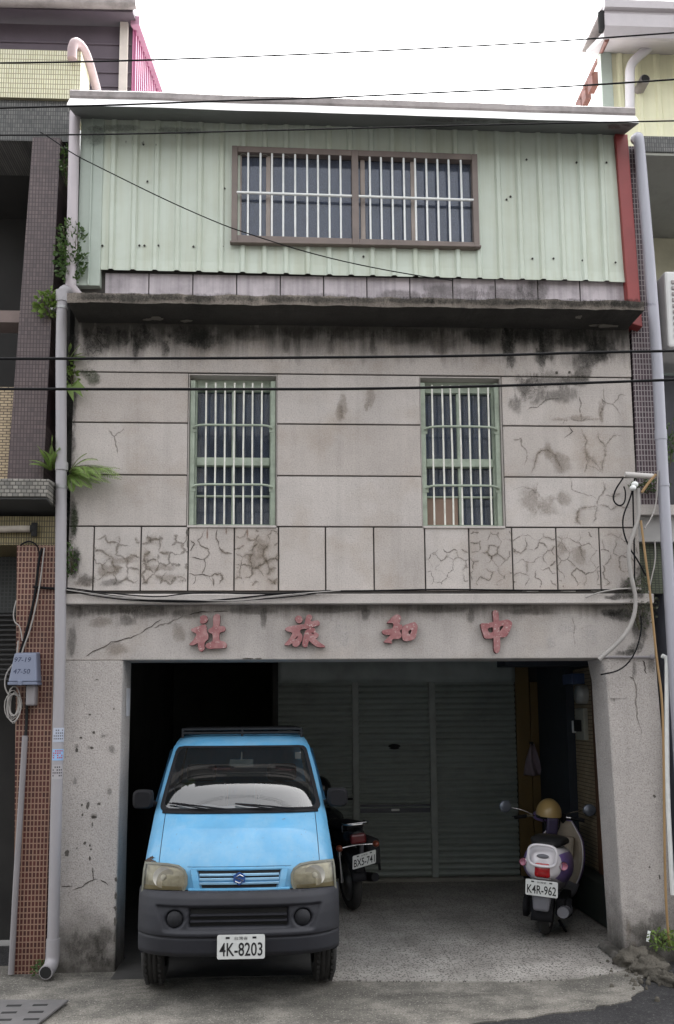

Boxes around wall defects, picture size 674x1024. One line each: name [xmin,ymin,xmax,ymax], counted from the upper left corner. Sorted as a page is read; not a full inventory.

water stain [67,327,212,357]
water stain [466,328,614,366]
crack [189,531,232,586]
crack [87,620,163,656]